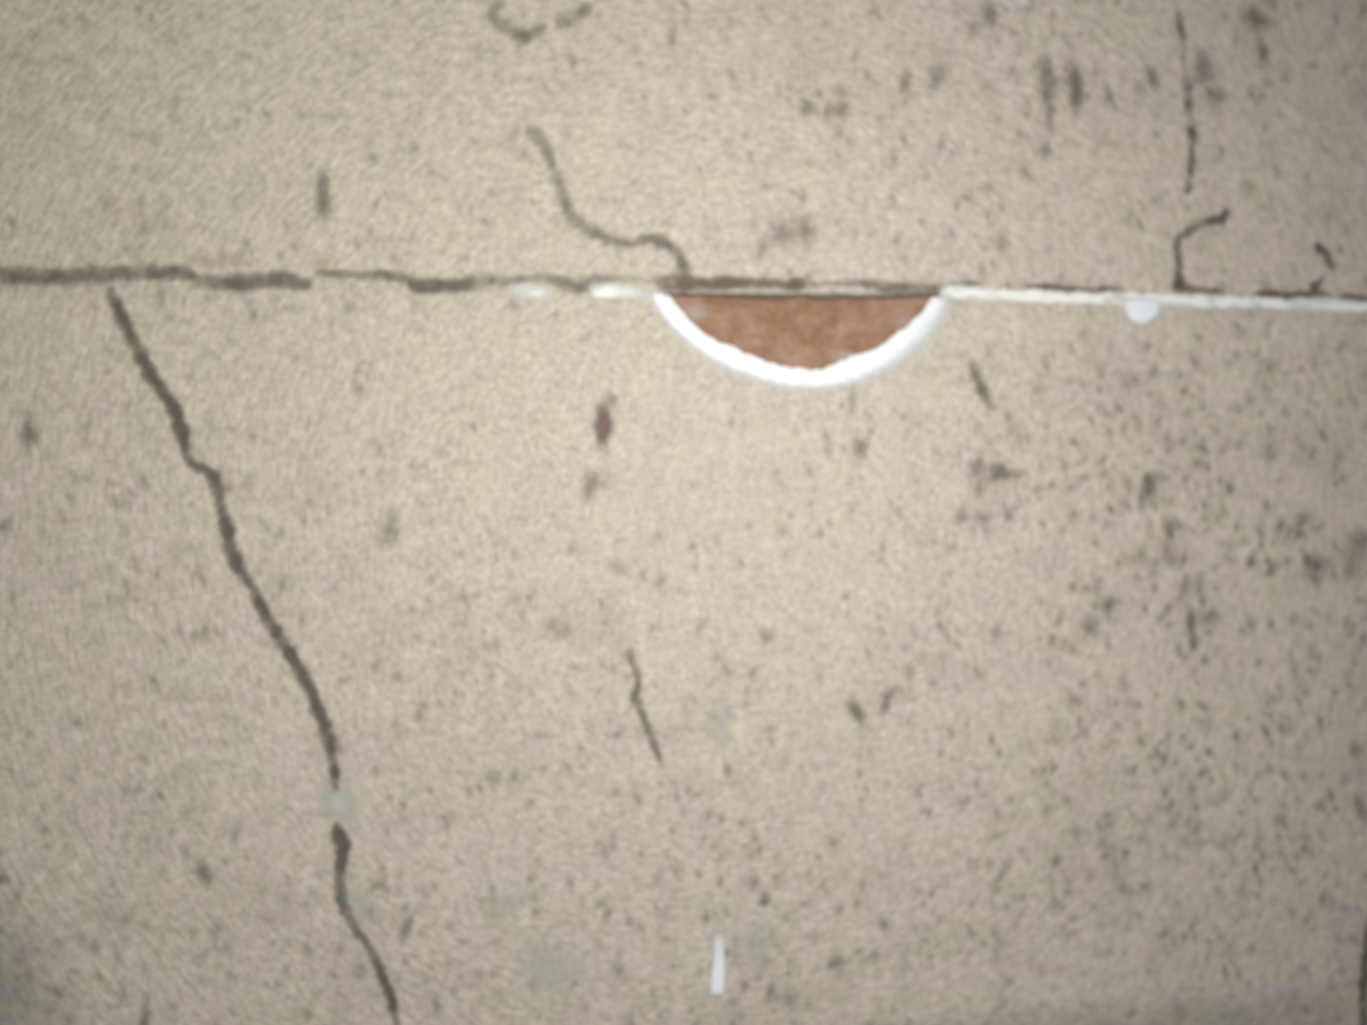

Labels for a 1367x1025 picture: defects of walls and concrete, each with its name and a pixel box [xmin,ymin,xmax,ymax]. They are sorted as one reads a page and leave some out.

crack [1175,86,1229,284]
crack [644,236,687,268]
crack [1311,245,1333,289]
spalling [592,284,1367,388]
crack [110,297,339,781]
crack [333,824,397,1013]
crack [1359,929,1367,1025]